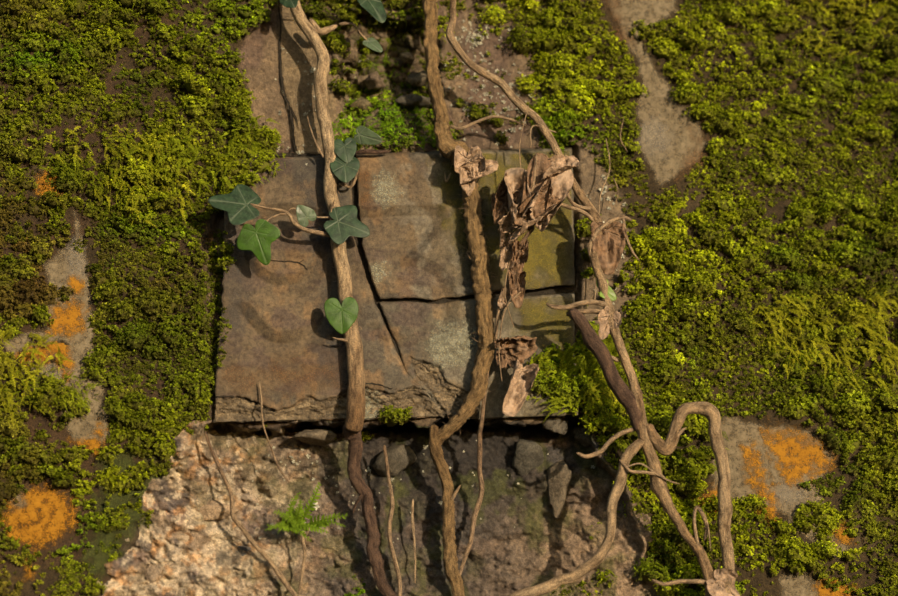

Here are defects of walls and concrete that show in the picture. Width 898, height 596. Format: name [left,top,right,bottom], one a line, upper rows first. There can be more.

crack [266,0,324,157]
crack [352,177,501,361]
crack [524,285,575,296]
spalling [96,359,468,596]
spalling [441,407,660,596]